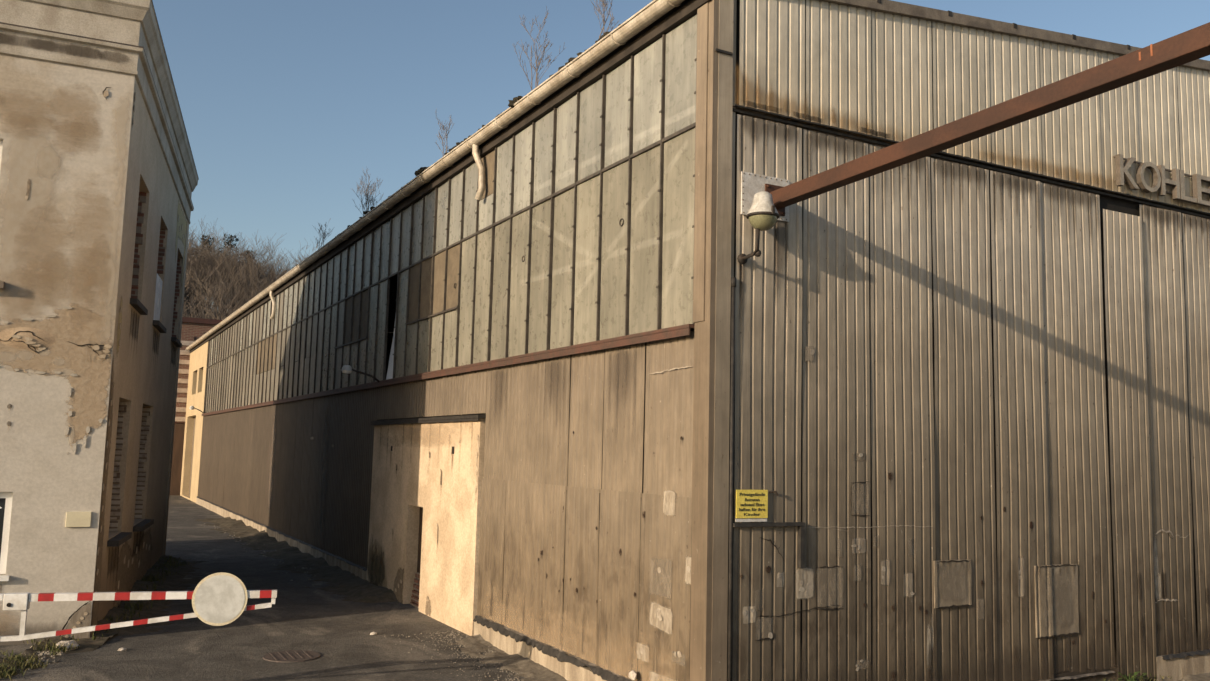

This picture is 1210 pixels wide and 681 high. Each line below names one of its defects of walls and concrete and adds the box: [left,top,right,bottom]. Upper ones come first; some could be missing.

crack [1,331,104,355]
peeling [0,297,152,639]